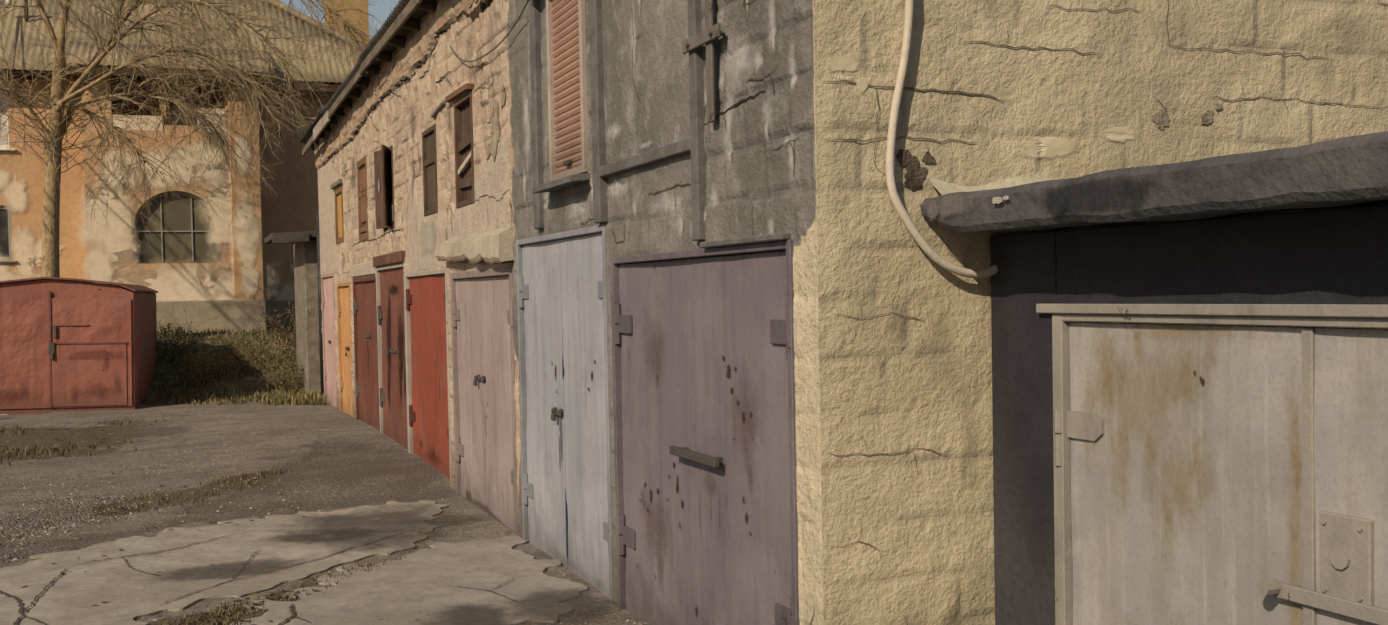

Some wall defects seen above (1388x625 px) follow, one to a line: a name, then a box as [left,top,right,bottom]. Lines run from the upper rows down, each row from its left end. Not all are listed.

crack [321,0,508,167]
crack [704,64,778,127]
crack [772,77,1004,177]
crack [961,5,1386,118]
flaking render [0,169,42,281]
flaking render [78,121,295,301]
water stain [367,285,406,402]